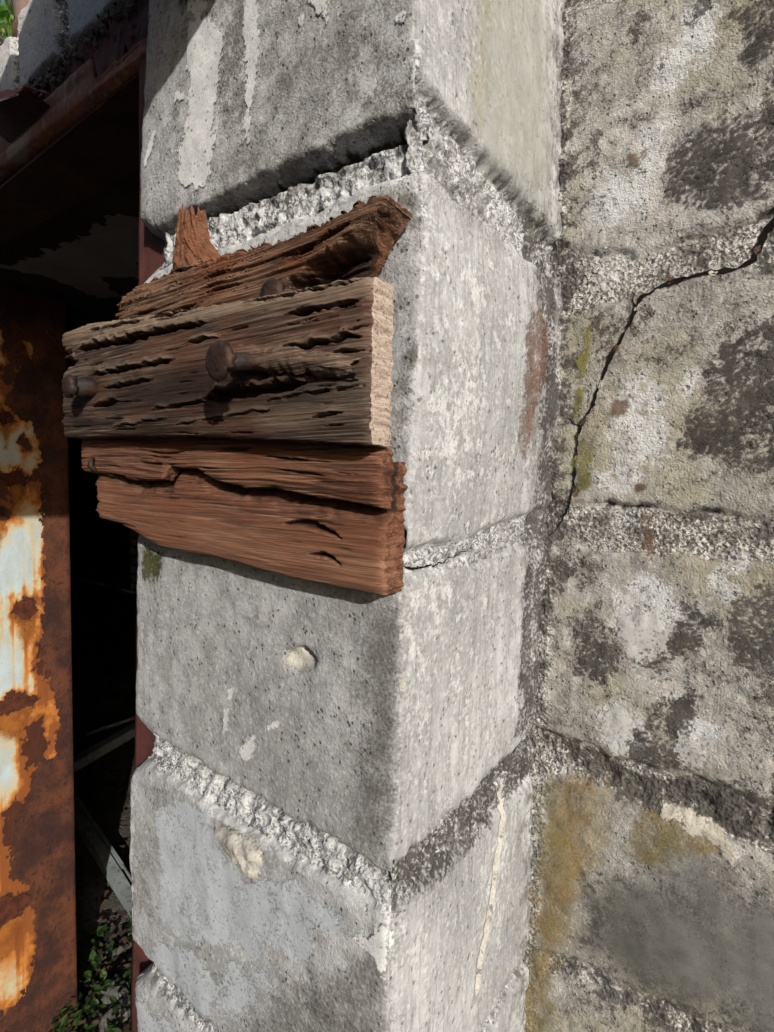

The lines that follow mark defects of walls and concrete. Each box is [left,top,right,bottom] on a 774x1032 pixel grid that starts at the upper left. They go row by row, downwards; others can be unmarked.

peeling [298,0,330,31]
peeling [242,0,260,144]
peeling [0,213,139,300]
crack [550,217,774,535]
rust [0,470,30,538]
rust [13,598,38,642]
rust [0,695,38,739]
rust [0,893,33,960]